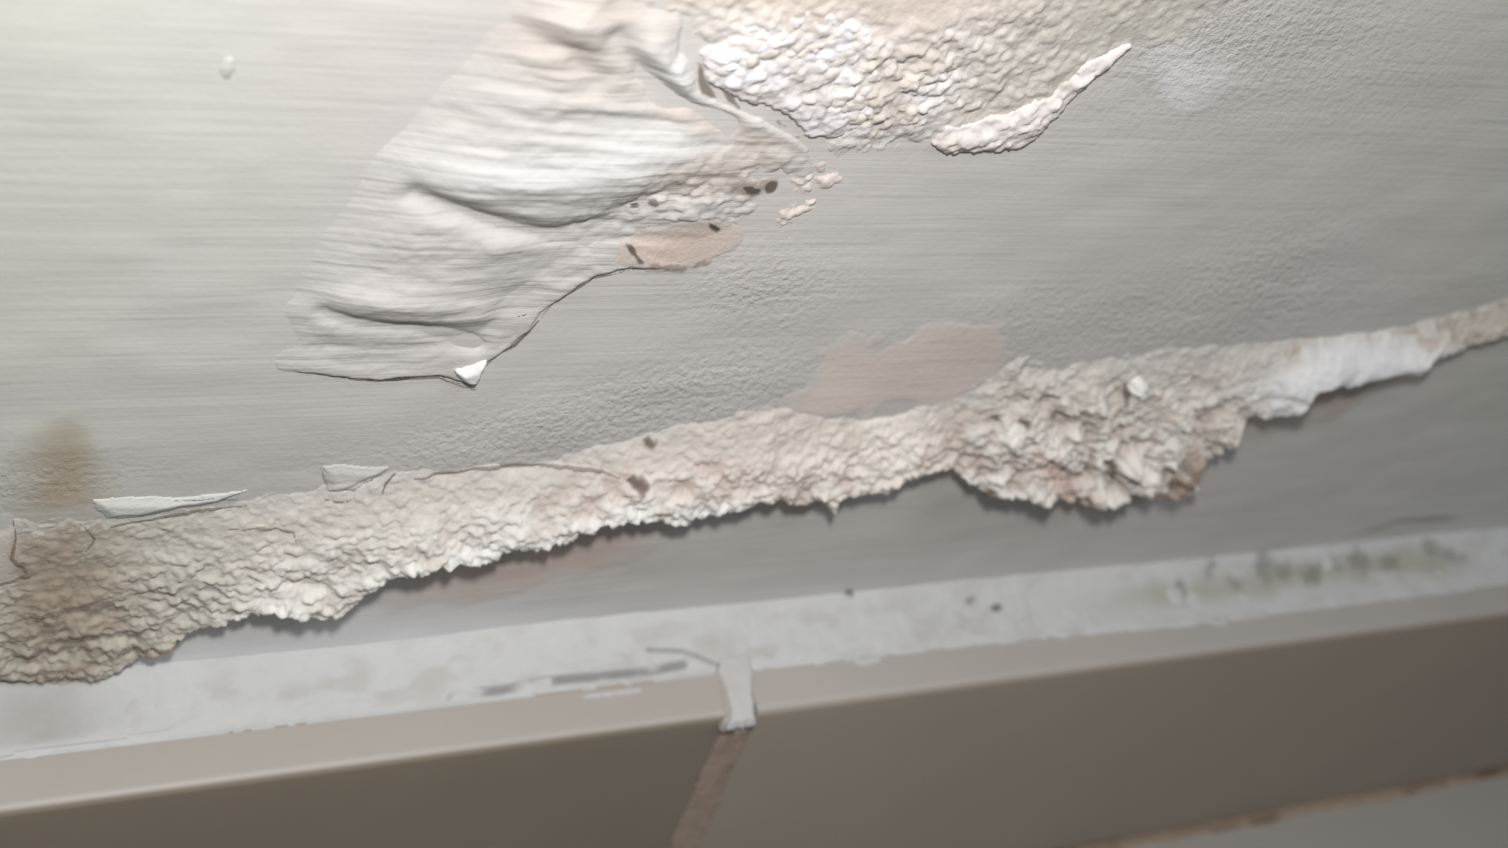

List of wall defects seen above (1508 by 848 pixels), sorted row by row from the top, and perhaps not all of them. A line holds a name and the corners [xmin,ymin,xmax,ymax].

spalling [635,0,1247,241]
crack [332,269,635,390]
peeling [628,245,709,271]
spalling [0,298,1508,684]